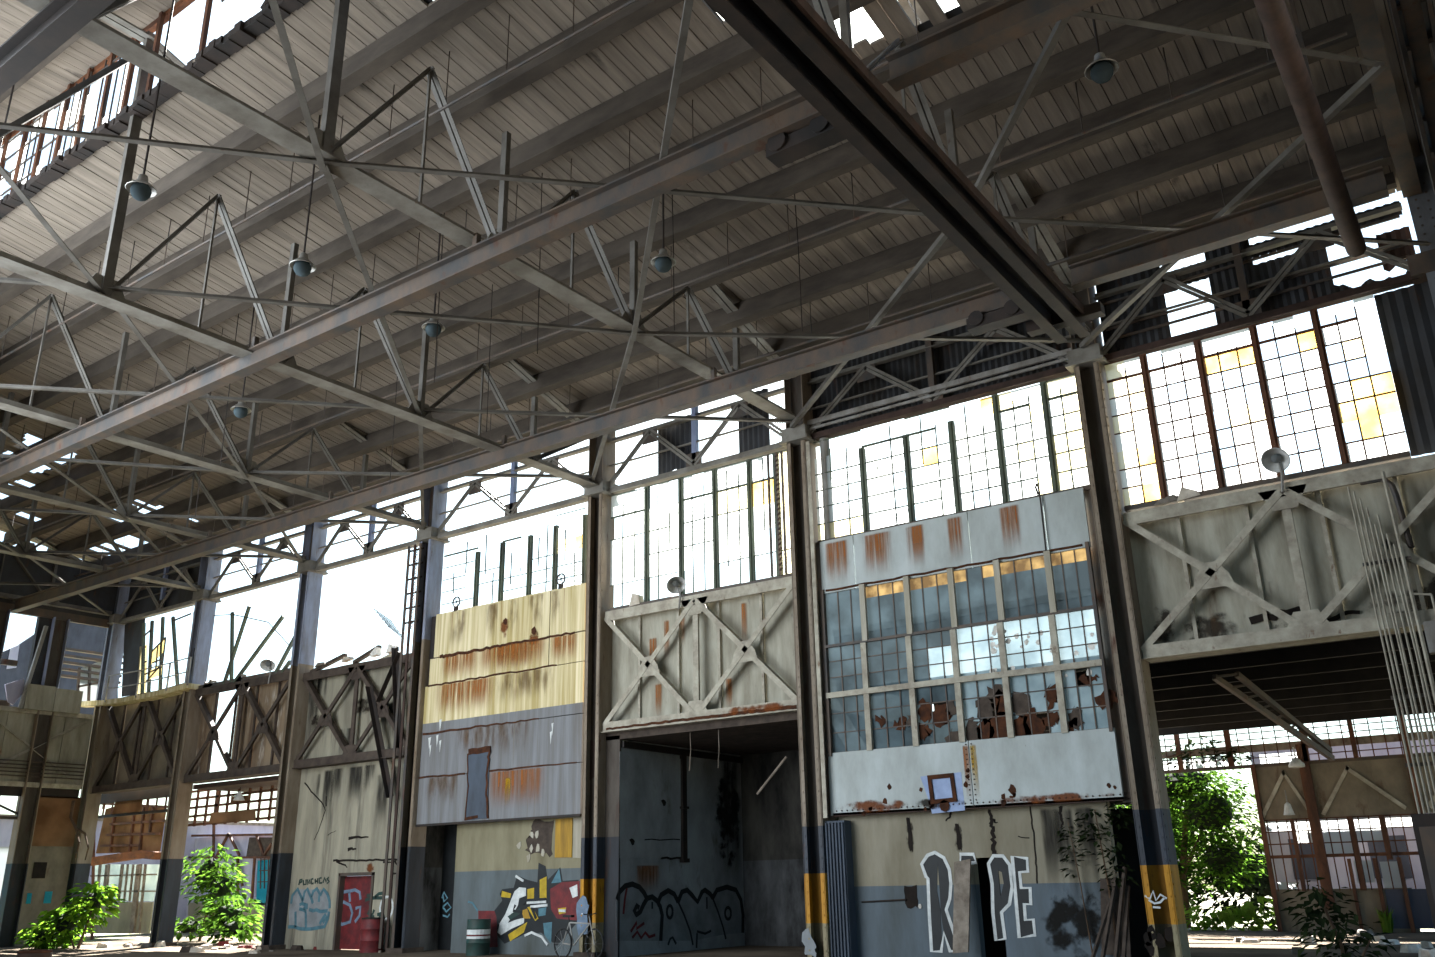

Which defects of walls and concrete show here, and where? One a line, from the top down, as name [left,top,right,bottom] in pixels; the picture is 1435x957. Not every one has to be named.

rust [865,533,886,560]
rust [908,525,923,552]
rust [948,517,961,543]
rust [826,540,1083,592]
rust [1001,505,1018,531]
rust [428,618,575,703]
water stain [318,765,398,808]
rust [419,718,577,821]